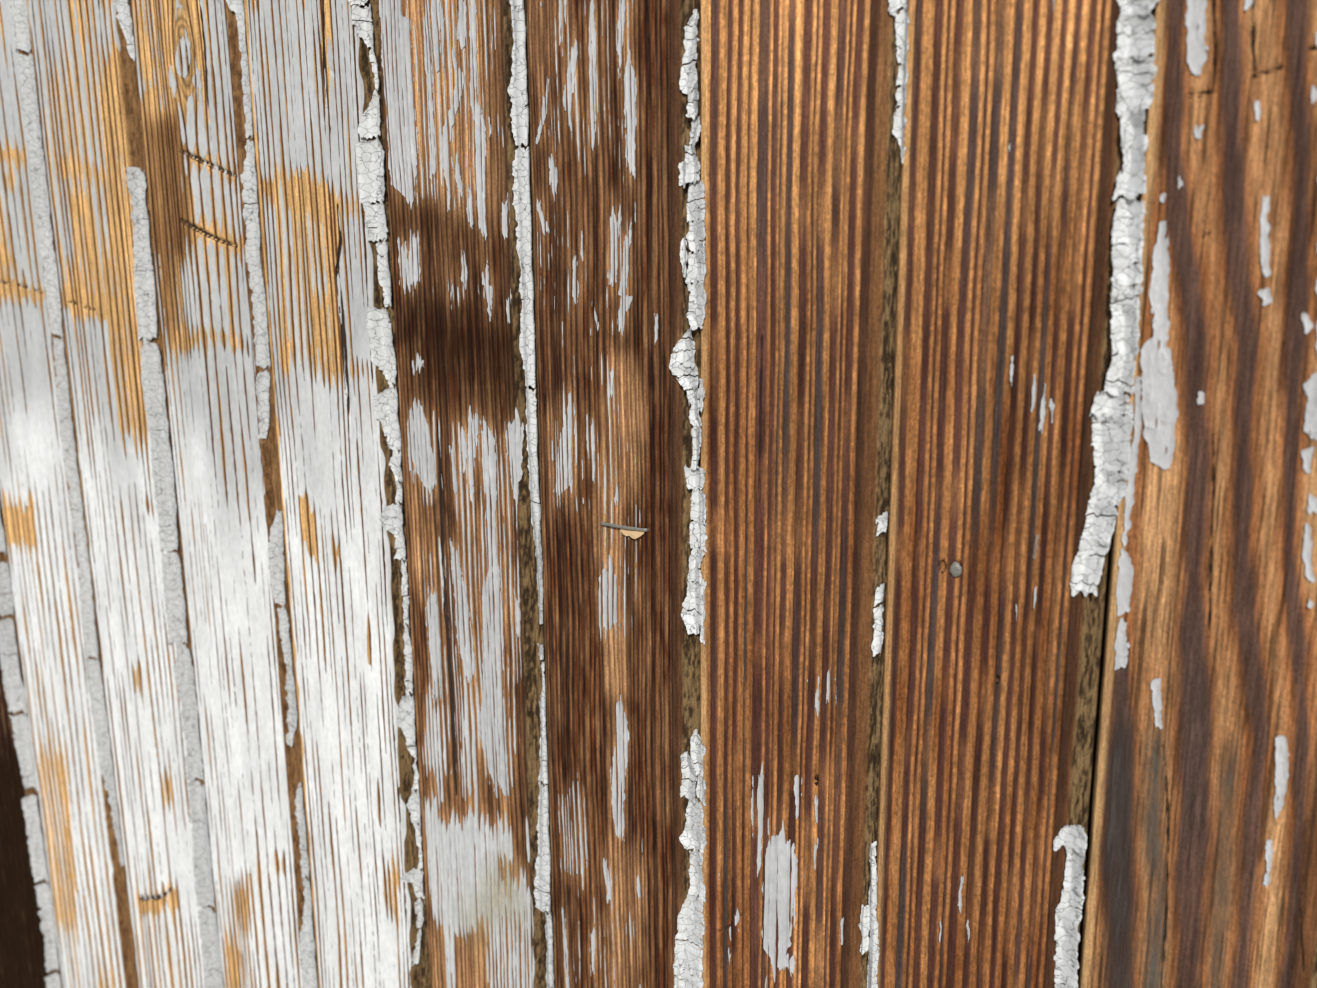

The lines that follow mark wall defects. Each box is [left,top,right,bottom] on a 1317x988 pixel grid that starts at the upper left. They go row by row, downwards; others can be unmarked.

peeling [888,0,910,164]
peeling [1185,0,1208,76]
peeling [669,9,708,645]
peeling [1070,0,1183,671]
peeling [1258,195,1273,306]
peeling [0,0,641,988]
peeling [1301,372,1317,474]
peeling [673,729,720,988]
peeling [751,762,819,988]
peeling [840,841,880,988]
peeling [1053,824,1087,988]
peeling [1274,735,1289,819]